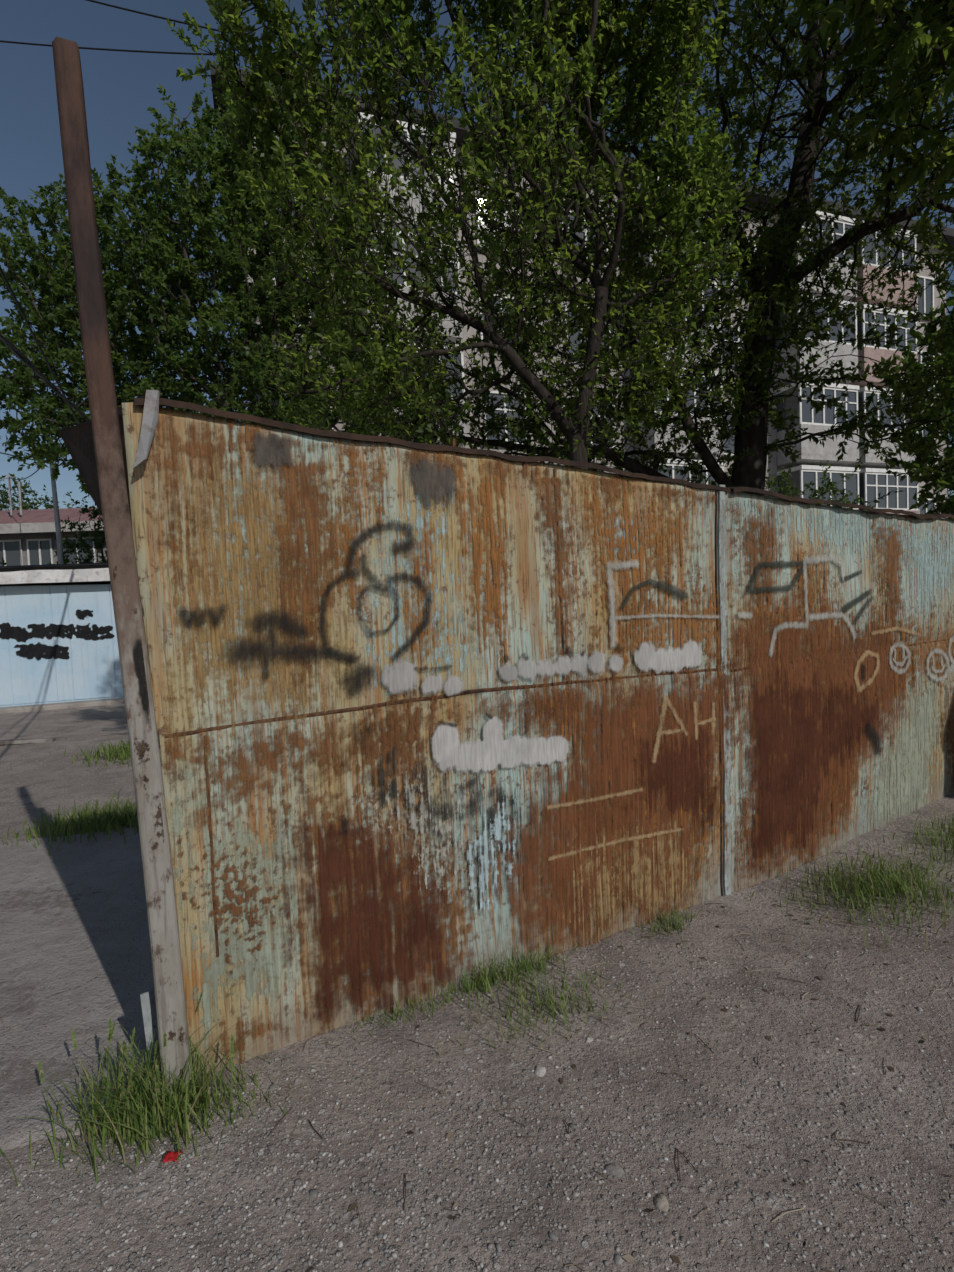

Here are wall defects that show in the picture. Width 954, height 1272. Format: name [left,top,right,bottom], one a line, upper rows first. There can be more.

peeling [372,771,474,895]
rust [151,415,954,1067]